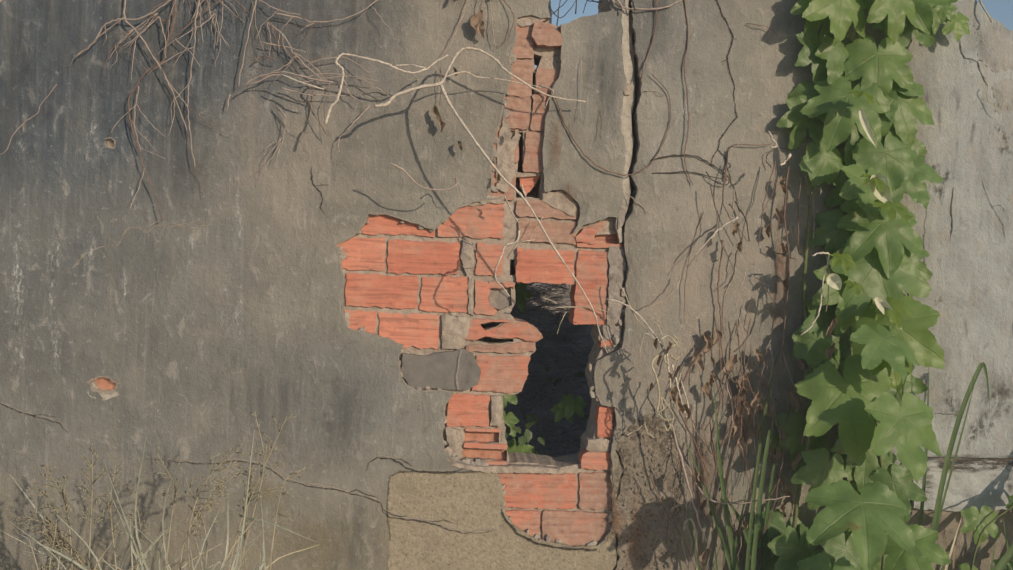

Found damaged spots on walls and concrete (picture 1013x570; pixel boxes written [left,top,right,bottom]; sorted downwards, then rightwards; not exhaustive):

crack [960,44,988,86]
crack [711,0,740,213]
crack [311,167,324,213]
crack [614,0,639,350]
spalling [334,16,685,570]
crack [145,455,495,534]
damp [940,459,1013,469]